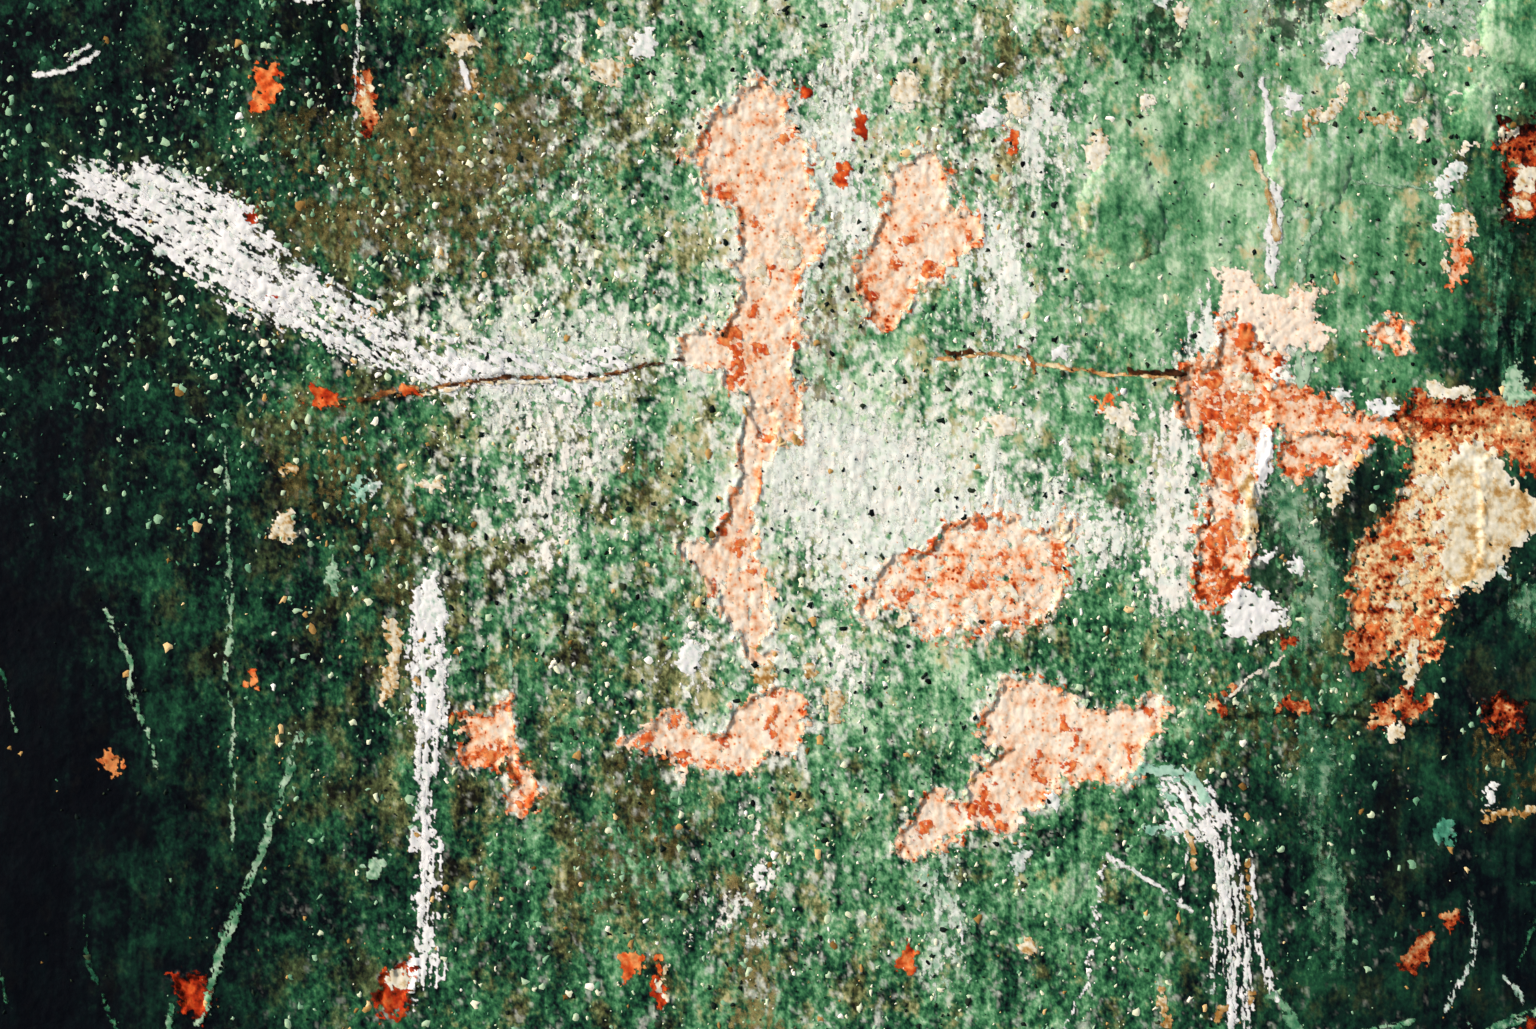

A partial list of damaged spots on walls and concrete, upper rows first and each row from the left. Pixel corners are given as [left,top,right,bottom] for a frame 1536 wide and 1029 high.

spalling [722,0,827,130]
spalling [67,120,197,261]
rust [1490,110,1536,232]
spalling [315,262,381,321]
spalling [806,262,860,319]
rust [1436,229,1474,293]
crack [334,357,685,406]
crack [936,345,1187,381]
peeling [618,273,1097,820]
rust [1170,310,1536,744]
rust [1477,689,1528,755]
spalling [707,961,774,1021]